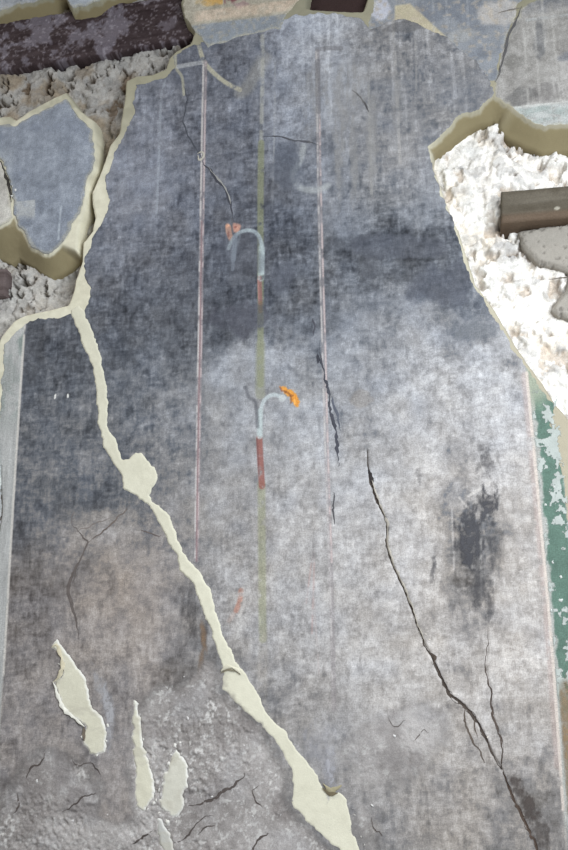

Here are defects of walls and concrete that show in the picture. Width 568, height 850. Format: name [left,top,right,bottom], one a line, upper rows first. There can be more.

crack [182,89,233,218]
crack [66,306,365,850]
crack [367,451,538,850]
water stain [454,486,498,601]
peeling [532,396,568,564]
peeling [550,599,568,625]
peeling [553,635,568,697]
spalling [0,639,327,850]
spalling [356,804,382,850]